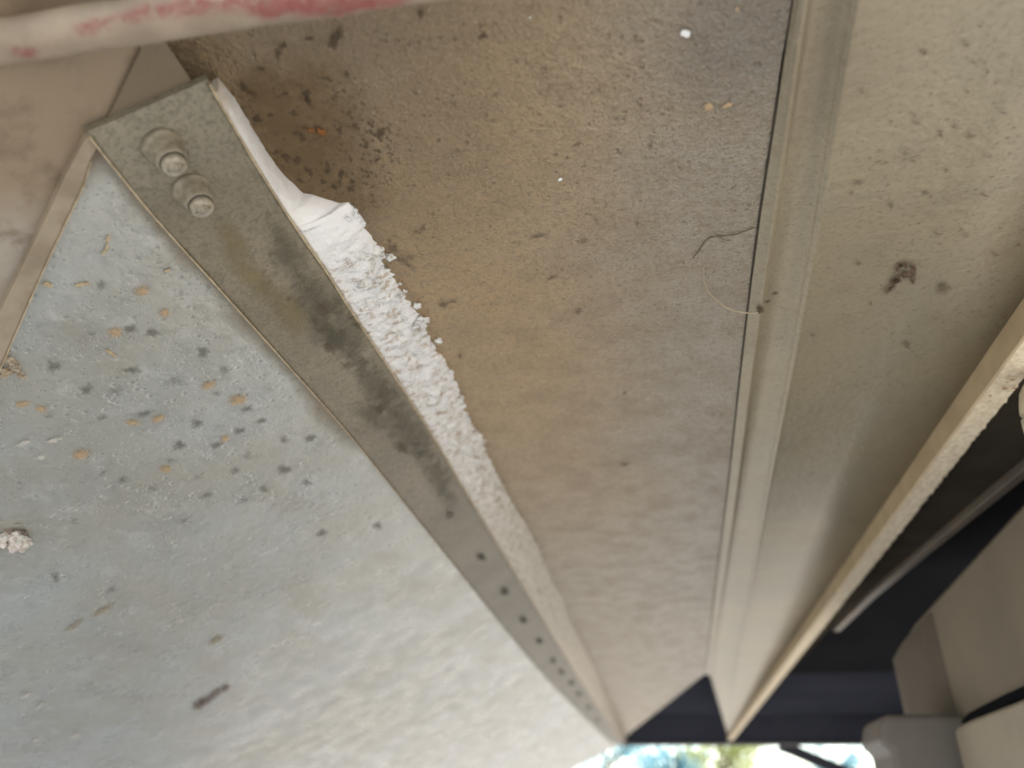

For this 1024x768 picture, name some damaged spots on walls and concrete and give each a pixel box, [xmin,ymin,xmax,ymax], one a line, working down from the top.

spalling [212,78,627,744]